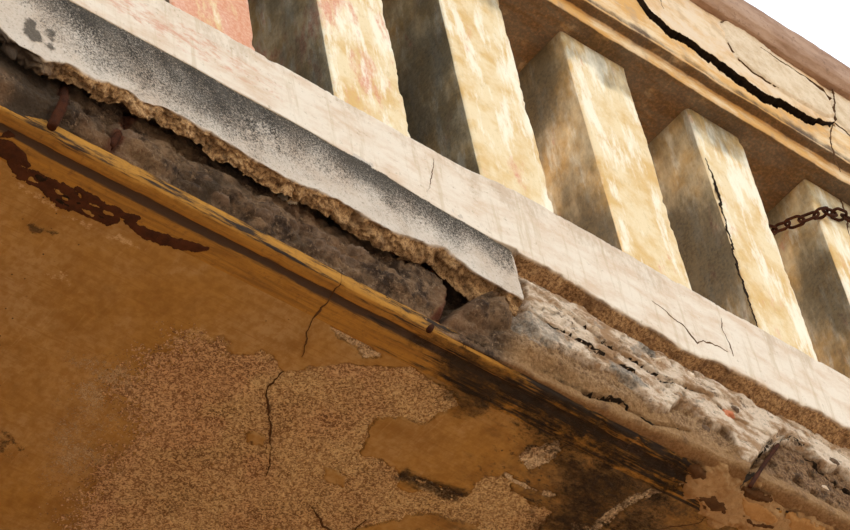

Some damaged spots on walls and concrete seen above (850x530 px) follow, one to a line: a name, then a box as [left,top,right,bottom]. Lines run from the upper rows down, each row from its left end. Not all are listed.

spalling [0,41,62,121]
crack [637,0,850,172]
peeling [0,130,210,253]
crack [302,270,343,356]
spalling [58,84,850,530]
crack [655,303,734,356]
crack [265,371,284,475]
leakage [394,469,468,501]
leakage [410,335,688,530]
corrosion [748,443,780,489]